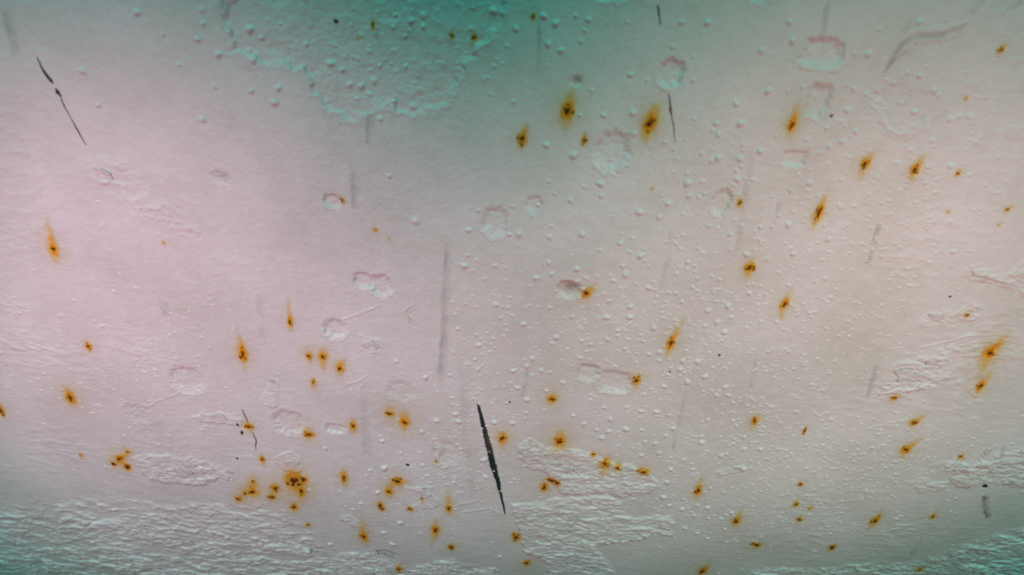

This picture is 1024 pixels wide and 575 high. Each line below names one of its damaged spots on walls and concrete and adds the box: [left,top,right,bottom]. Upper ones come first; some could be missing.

corrosion [560,97,575,119]
corrosion [642,107,658,134]
corrosion [813,199,825,224]
corrosion [48,235,57,256]
corrosion [238,342,247,362]
corrosion [982,341,1002,365]
corrosion [110,450,131,471]
corrosion [234,470,308,511]
peeling [509,437,676,575]